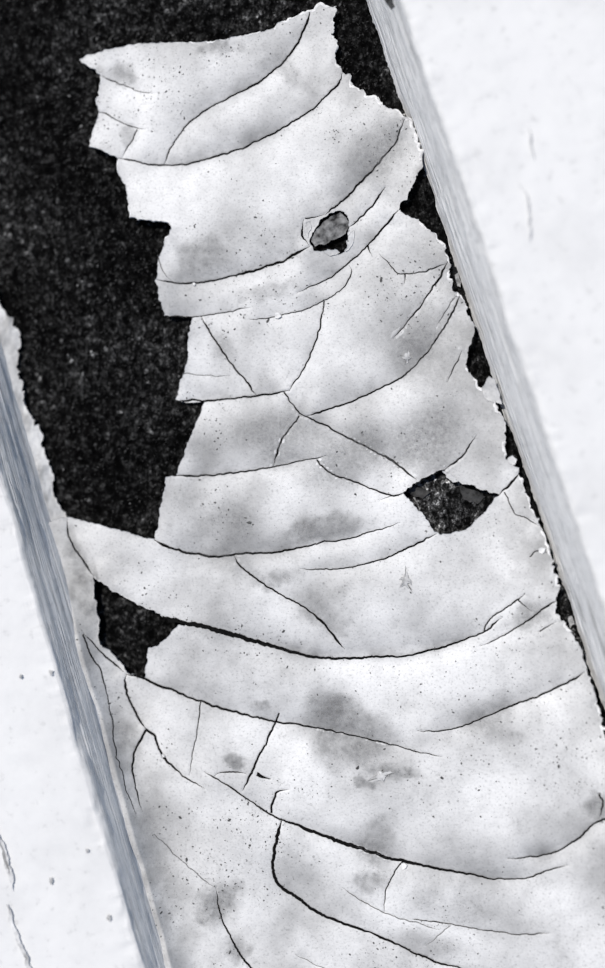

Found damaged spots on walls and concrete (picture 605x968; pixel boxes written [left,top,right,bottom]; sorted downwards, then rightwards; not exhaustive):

peeling [79,2,343,165]
crack [98,12,342,166]
peeling [117,73,465,475]
crack [156,120,461,500]
peeling [0,304,67,521]
crack [67,523,94,576]
peeling [49,297,605,968]
crack [155,524,558,660]
crack [447,436,476,468]
crack [499,472,539,526]
crack [82,634,605,968]
crack [0,839,31,968]